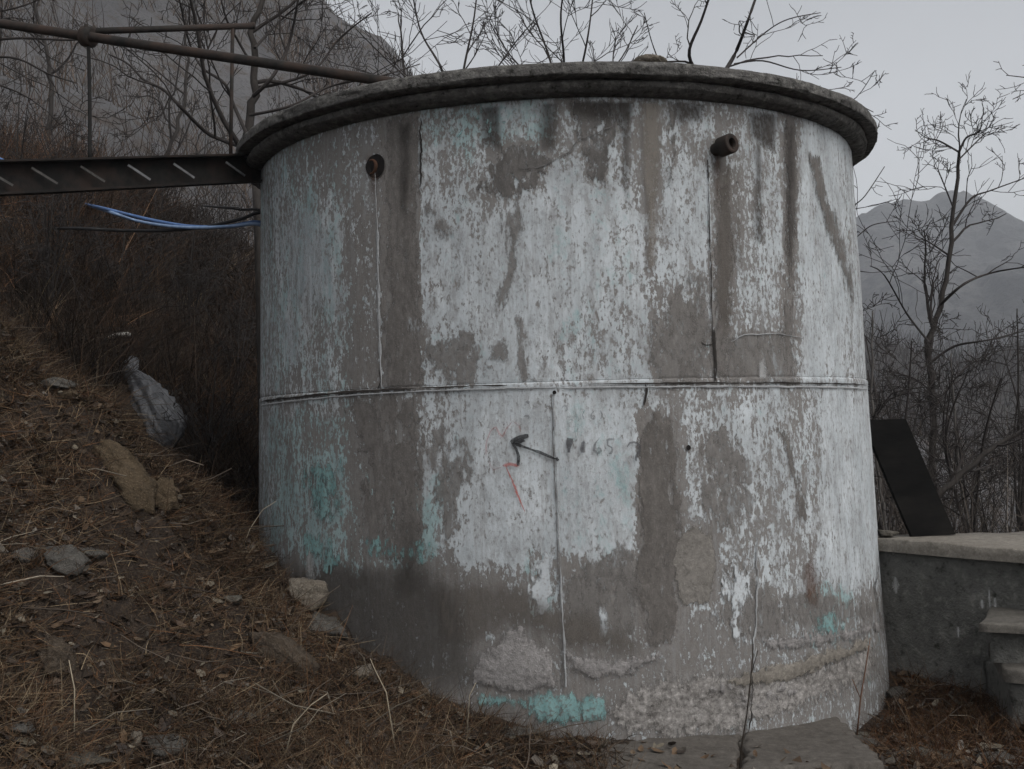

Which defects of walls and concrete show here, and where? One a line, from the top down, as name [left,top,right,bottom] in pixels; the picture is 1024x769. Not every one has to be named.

damp [485,107,499,145]
peeling [572,99,623,186]
damp [574,102,630,136]
peeling [425,142,552,394]
crack [595,160,864,405]
peeling [648,115,856,389]
peeling [344,394,474,575]
peeling [565,408,683,647]
peeling [696,425,761,534]
peeling [777,427,807,522]
peeling [710,562,881,641]
spalling [607,637,880,738]